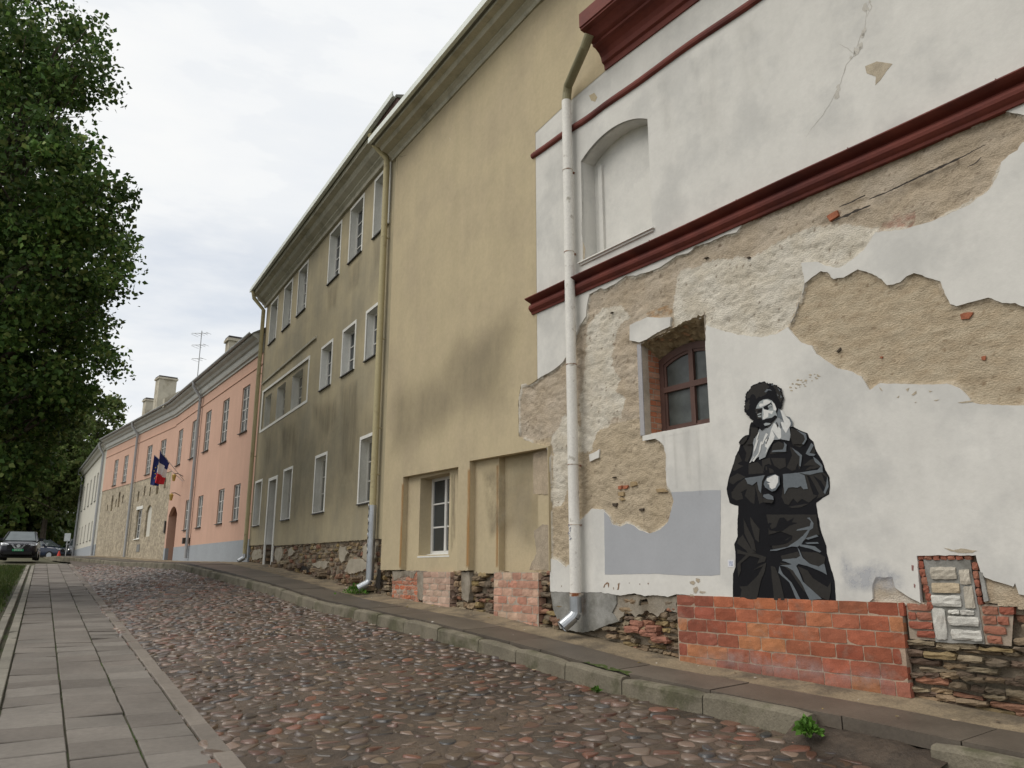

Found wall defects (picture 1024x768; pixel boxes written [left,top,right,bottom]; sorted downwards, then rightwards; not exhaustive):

crack [806,0,872,137]
peeling [865,61,892,85]
spalling [518,112,1024,571]